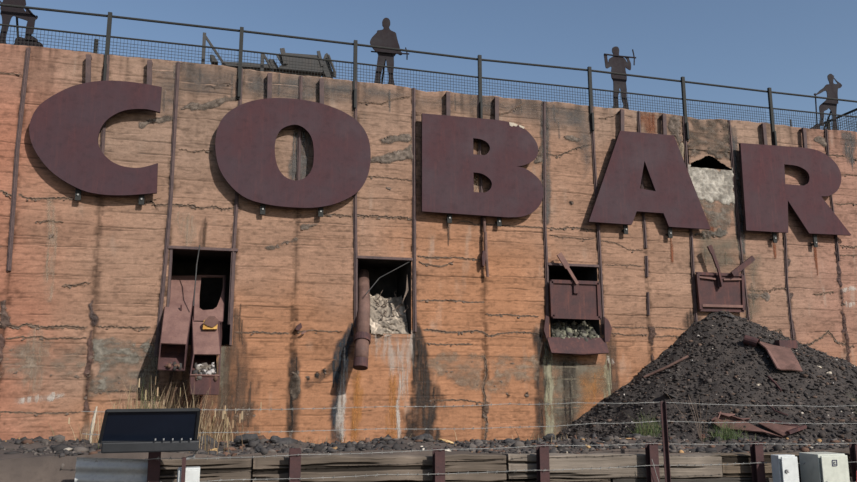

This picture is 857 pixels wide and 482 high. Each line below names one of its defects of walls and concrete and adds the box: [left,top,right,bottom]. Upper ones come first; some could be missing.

spalling [668,116,682,147]
crack [830,154,857,177]
peeling [688,164,735,239]
crack [418,254,481,267]
crack [840,245,857,257]
crack [0,321,151,340]
crack [773,329,856,348]
damp [289,357,298,386]
damp [320,323,354,442]
damp [396,326,440,441]
damp [287,395,299,434]